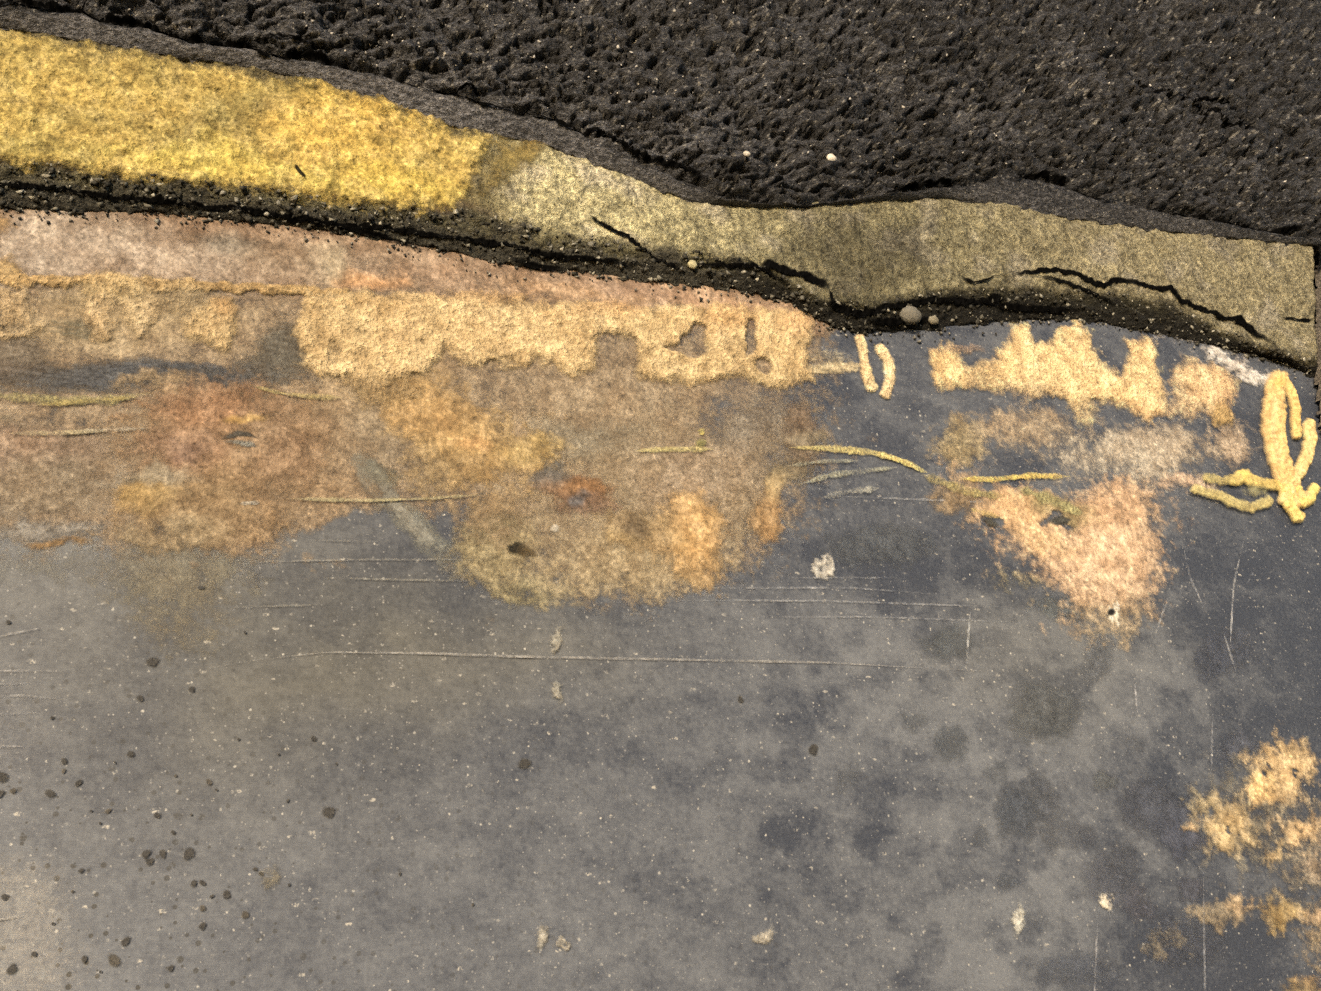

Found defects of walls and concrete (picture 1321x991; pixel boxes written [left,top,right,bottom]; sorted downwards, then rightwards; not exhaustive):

crack [881,177,962,196]
crack [1014,169,1116,201]
crack [0,181,1311,341]
corrosion [115,368,333,554]
corrosion [347,377,724,587]
corrosion [751,406,824,541]
corrosion [931,473,1210,632]
corrosion [1183,740,1321,884]
corrosion [1189,892,1321,943]
corrosion [1293,978,1320,991]